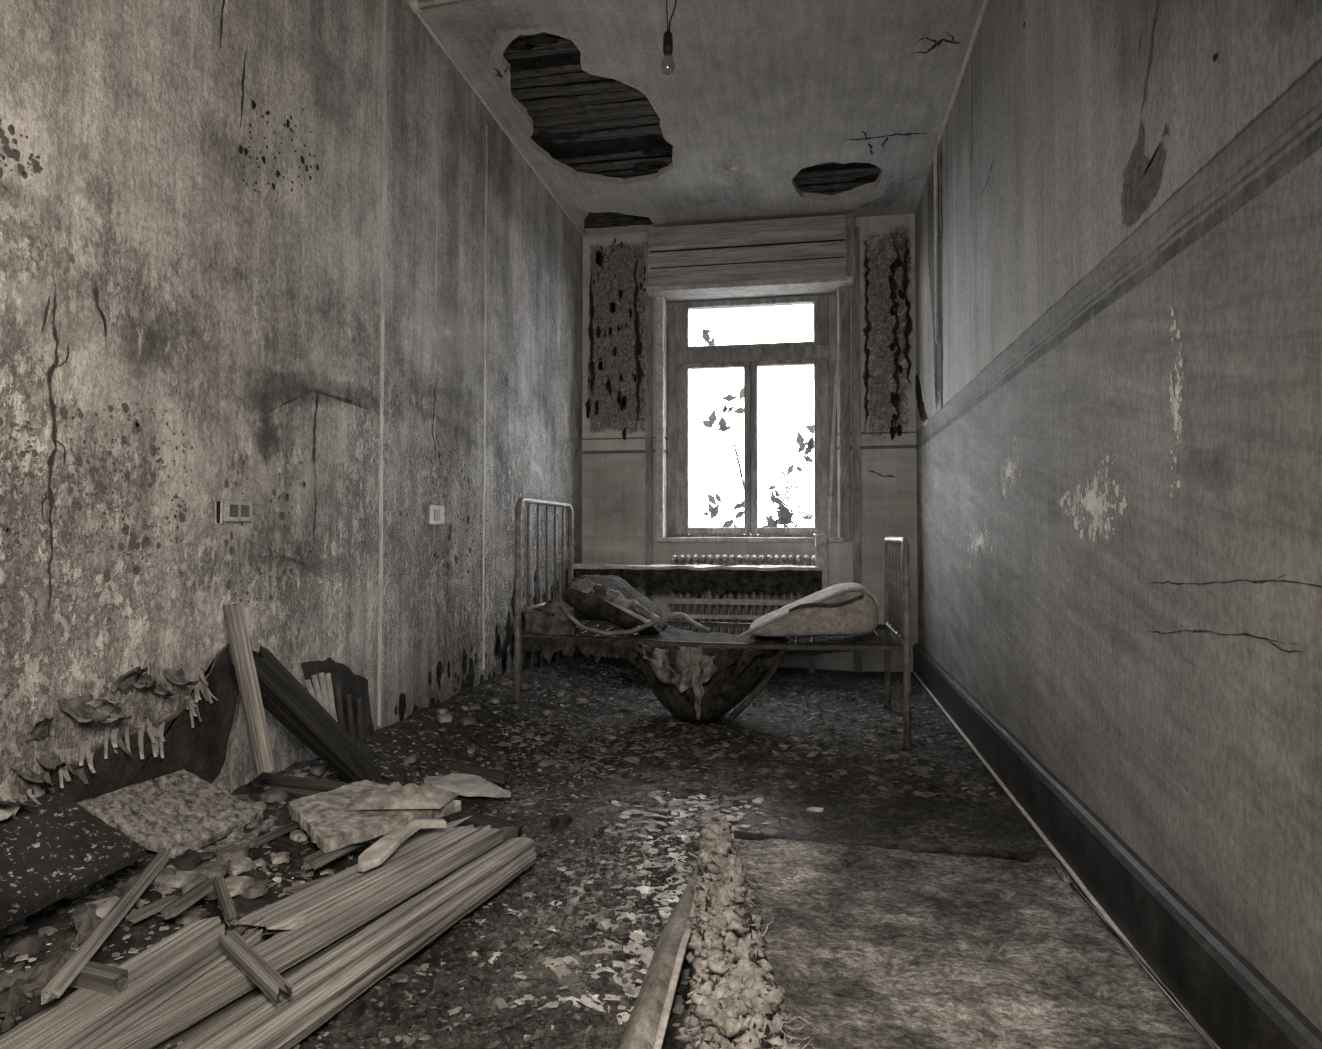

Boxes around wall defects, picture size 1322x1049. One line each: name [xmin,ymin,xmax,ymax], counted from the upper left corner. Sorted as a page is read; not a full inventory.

crack [41,271,69,611]
peeling [585,237,646,441]
peeling [863,140,943,441]
peeling [1060,455,1127,542]
crack [1145,630,1303,653]
crack [1149,575,1322,587]